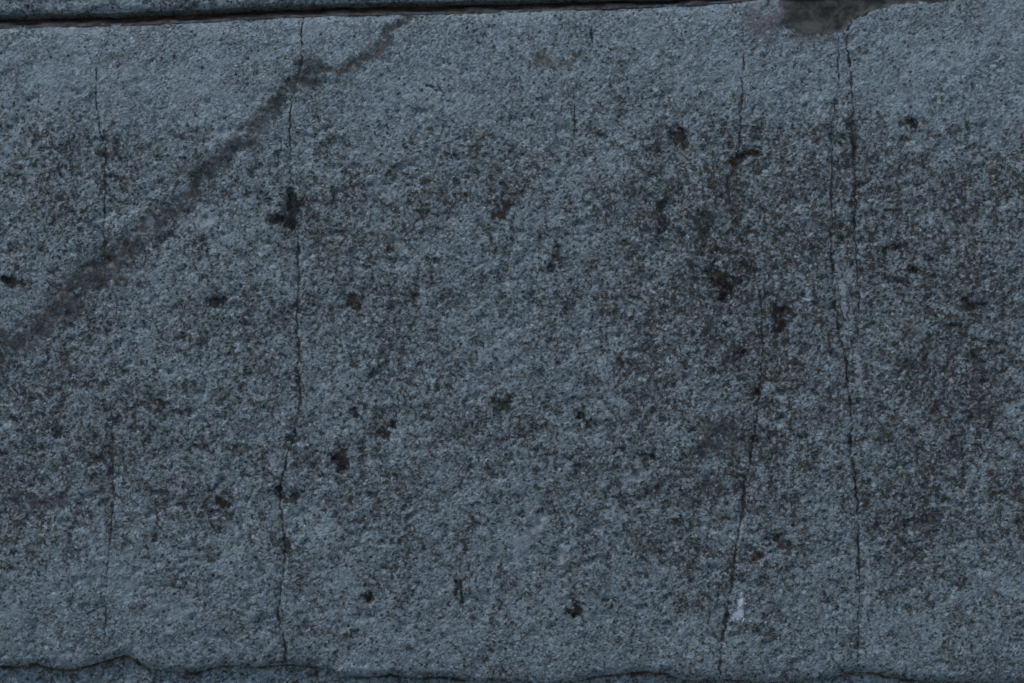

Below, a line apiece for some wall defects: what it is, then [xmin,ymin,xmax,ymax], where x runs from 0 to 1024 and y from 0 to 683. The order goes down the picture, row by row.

leakage [0,15,418,371]
crack [287,17,304,200]
crack [186,229,464,682]
crack [701,26,764,683]
crack [825,36,915,682]
crack [0,655,144,672]
crack [586,671,671,681]